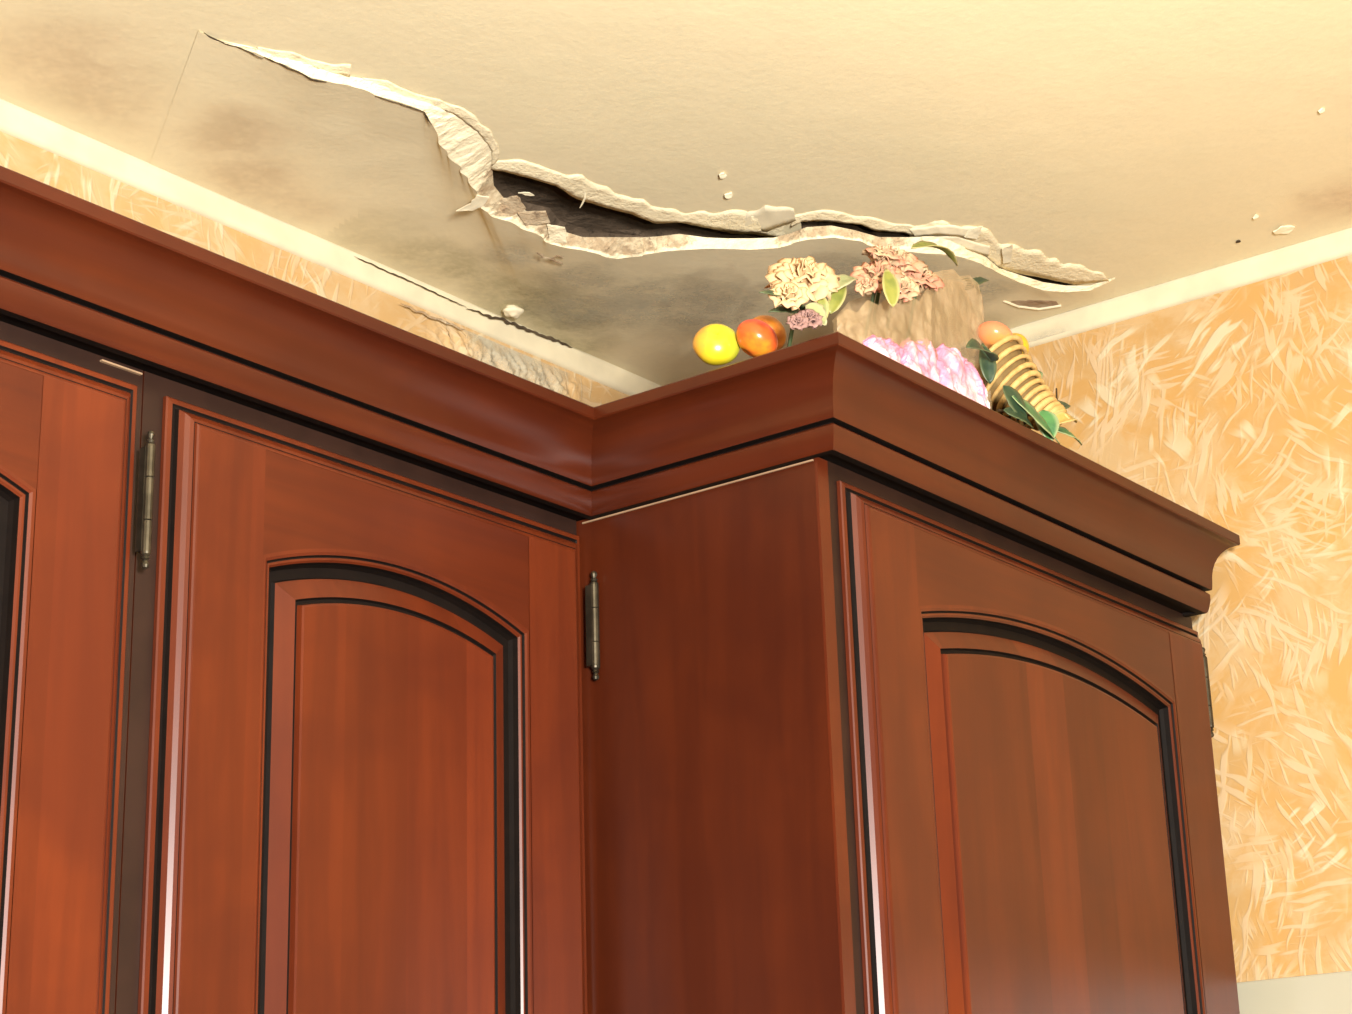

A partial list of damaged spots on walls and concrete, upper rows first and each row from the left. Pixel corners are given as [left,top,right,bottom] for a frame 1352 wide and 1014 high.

spalling [257,47,1109,285]
spalling [1003,300,1061,310]
damp [479,336,547,384]